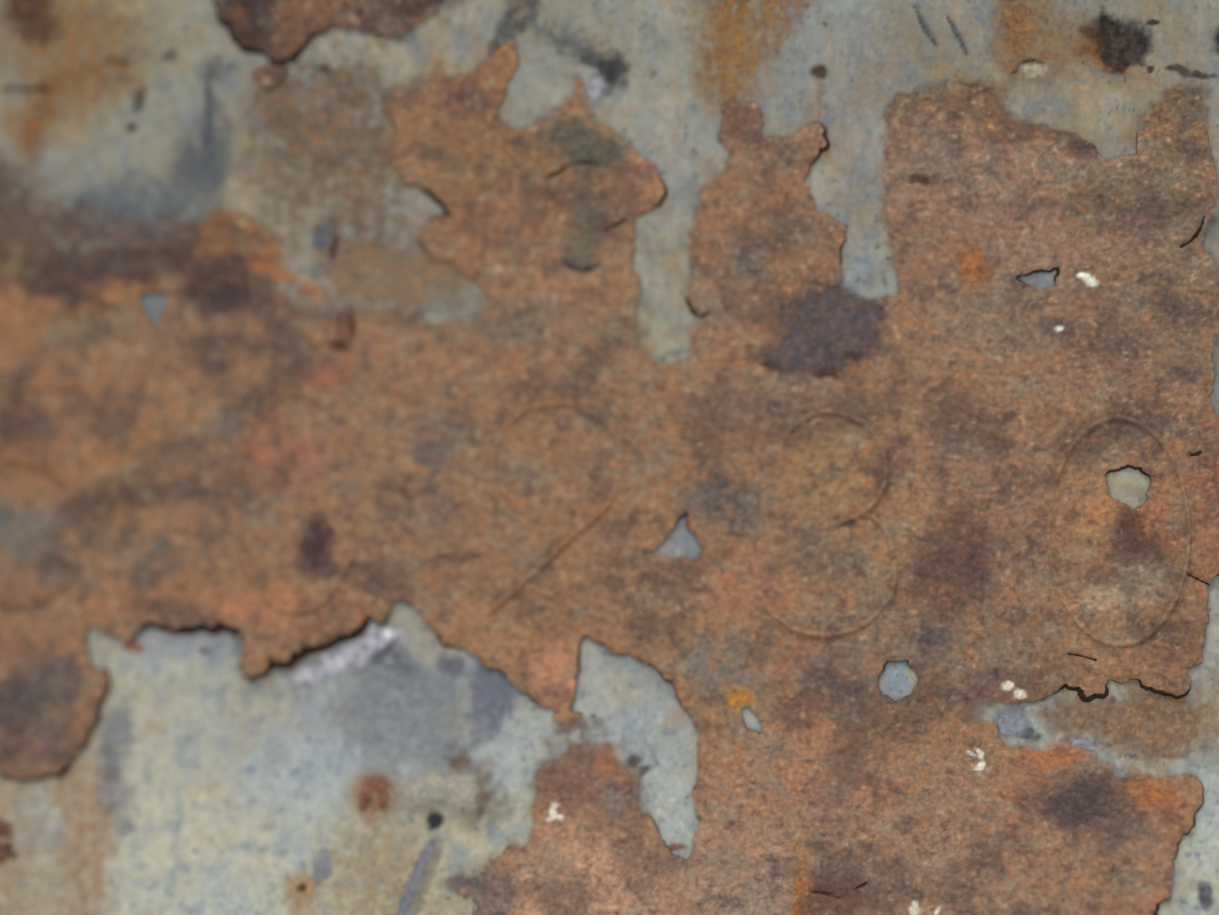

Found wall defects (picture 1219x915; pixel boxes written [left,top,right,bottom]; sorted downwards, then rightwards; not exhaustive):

rust [213,0,454,89]
rust [703,0,798,101]
rust [0,383,83,392]
rust [0,458,87,608]
rust [234,389,362,616]
rust [483,400,624,625]
rust [757,409,899,639]
rust [1046,415,1192,648]
rust [729,694,748,706]
rust [1044,693,1202,759]
rust [355,777,396,817]
rust [790,875,818,915]